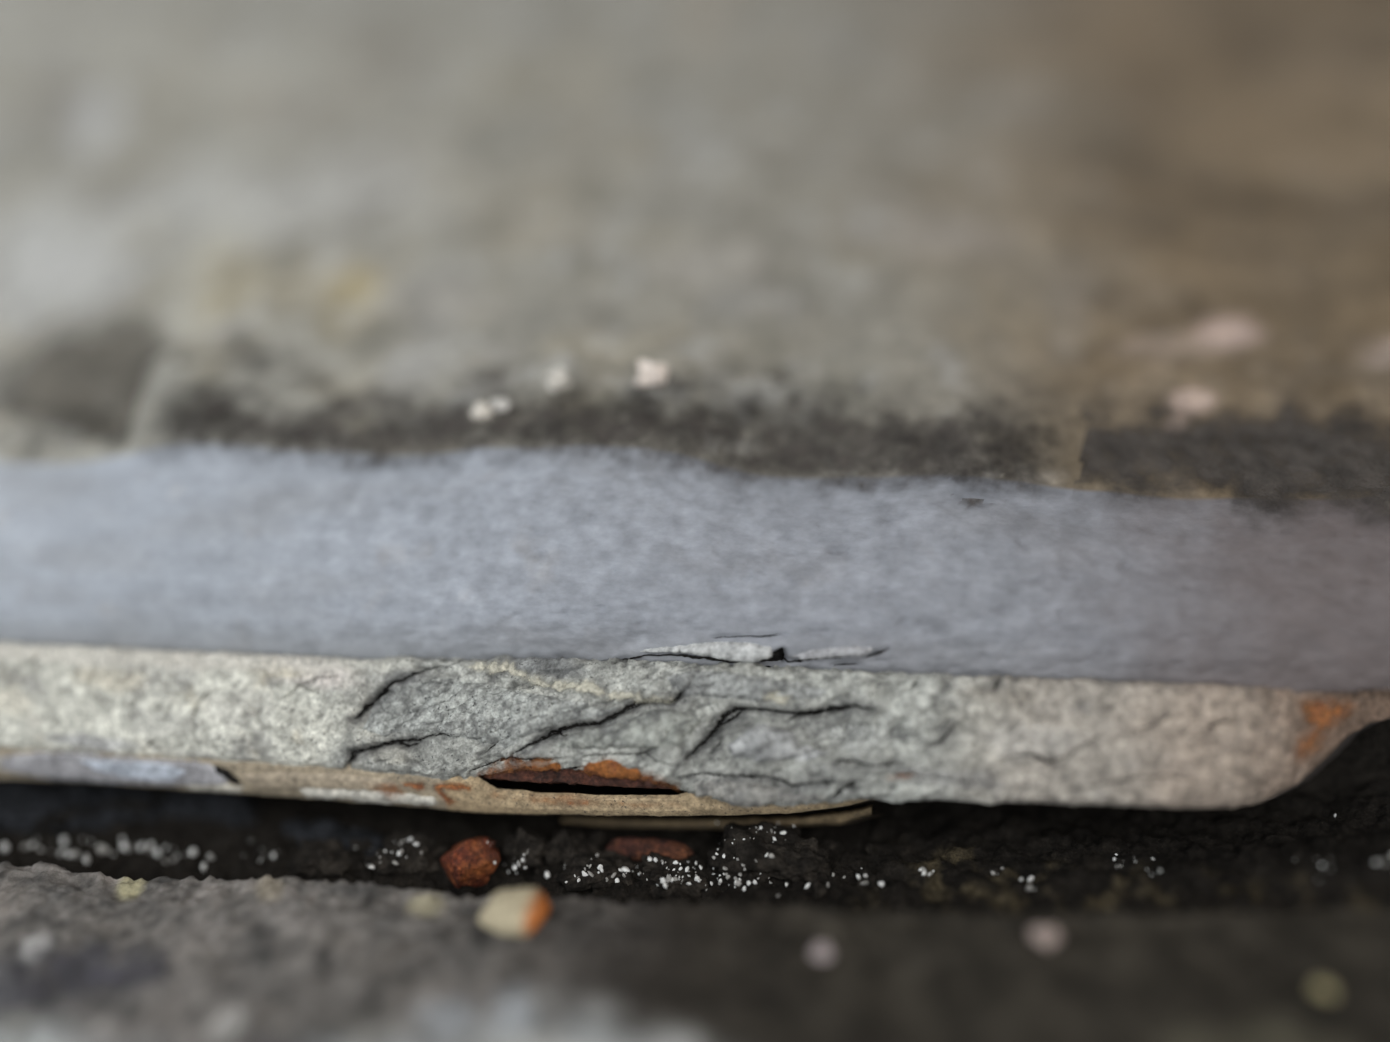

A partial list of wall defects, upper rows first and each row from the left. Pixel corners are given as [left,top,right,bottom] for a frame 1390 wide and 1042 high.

crack [285,675,338,699]
crack [348,666,449,763]
rust [377,760,678,805]
spalling [0,634,1390,825]
crack [472,692,982,799]
crack [1013,715,1170,764]